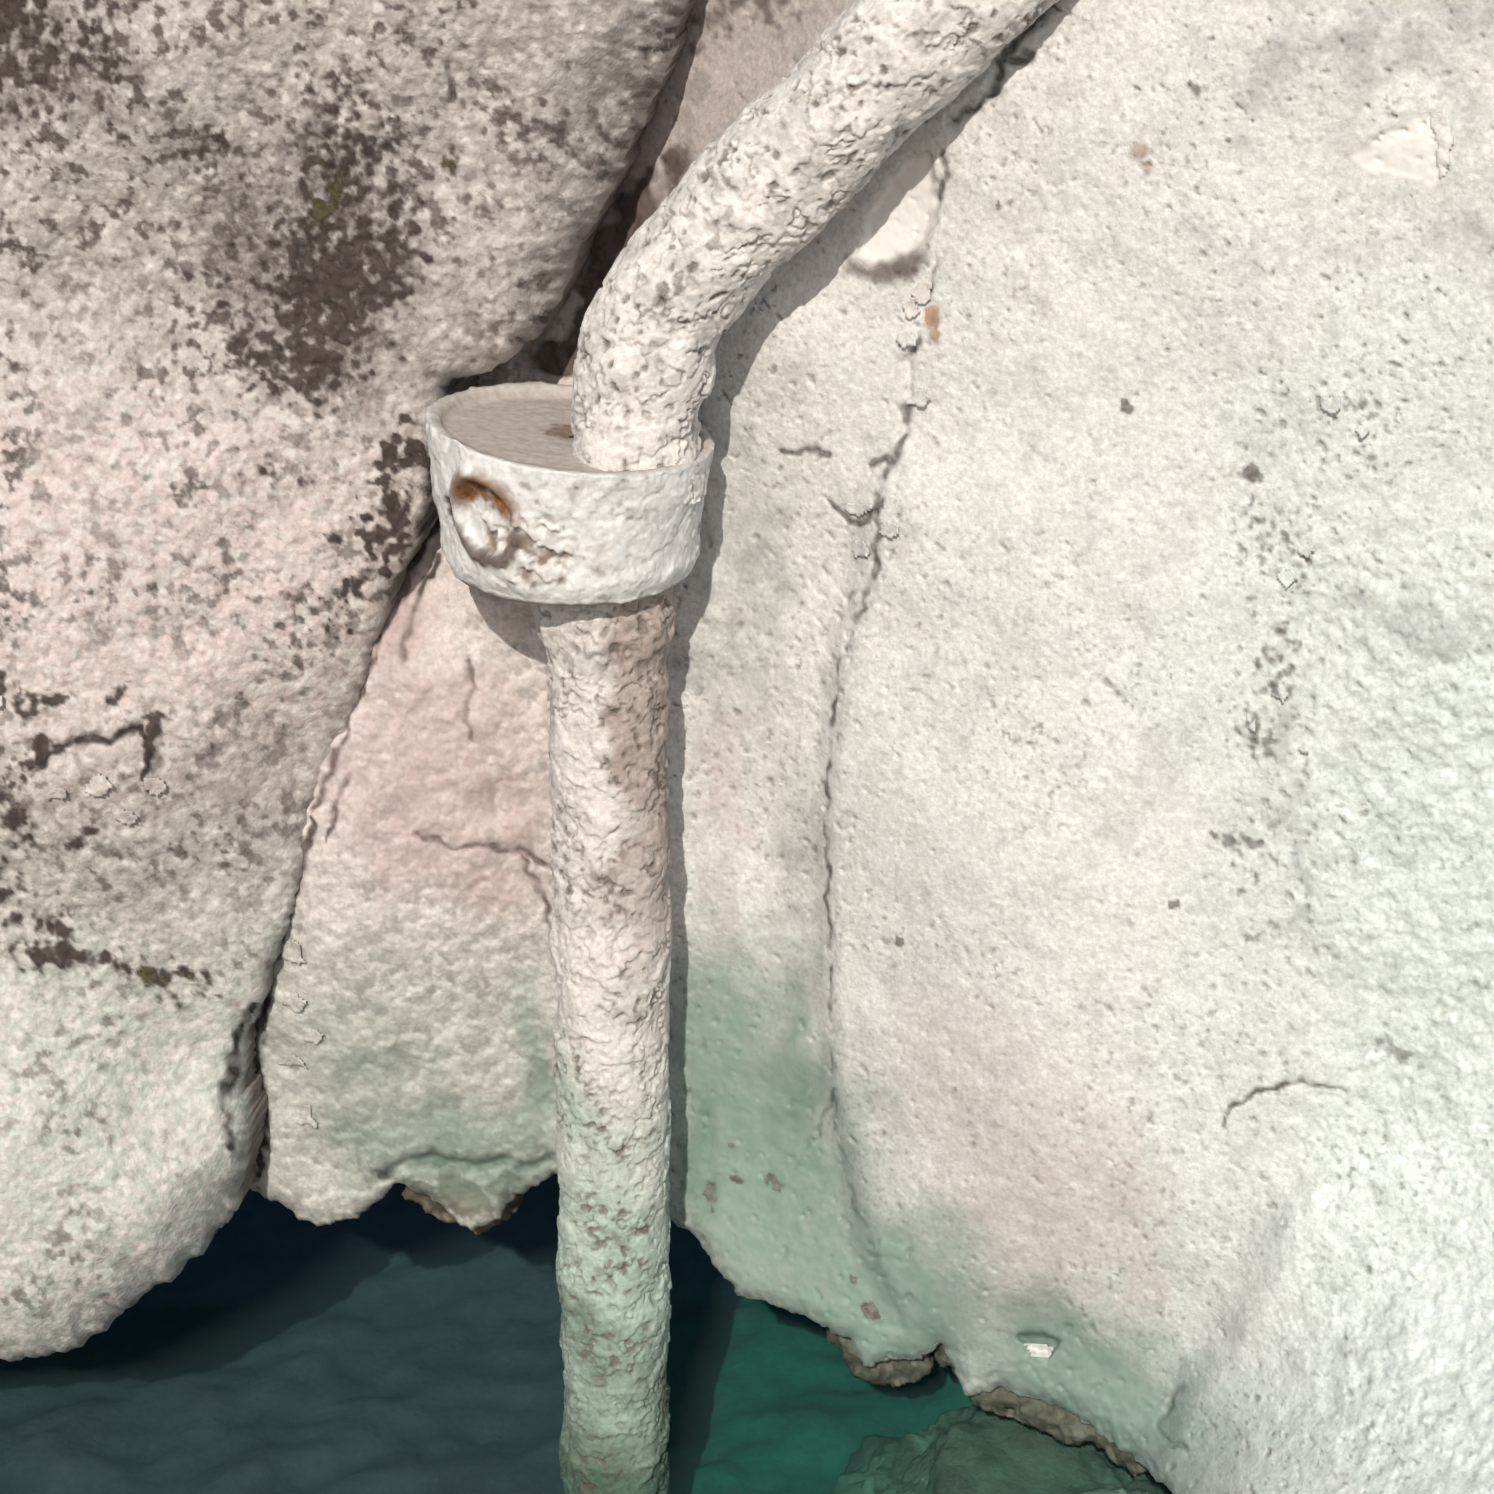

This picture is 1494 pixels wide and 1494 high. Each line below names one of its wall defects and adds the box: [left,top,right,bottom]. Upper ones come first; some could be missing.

mould [0,0,139,129]
spalling [1350,111,1454,191]
mould [174,55,433,431]
mould [302,413,431,603]
corrosion [450,477,512,517]
corrosion [455,526,518,567]
crack [828,404,911,613]
crack [36,725,154,781]
water stain [0,670,221,1008]
crack [414,831,551,921]
crack [1224,1080,1332,1122]
spalling [826,1327,1149,1478]